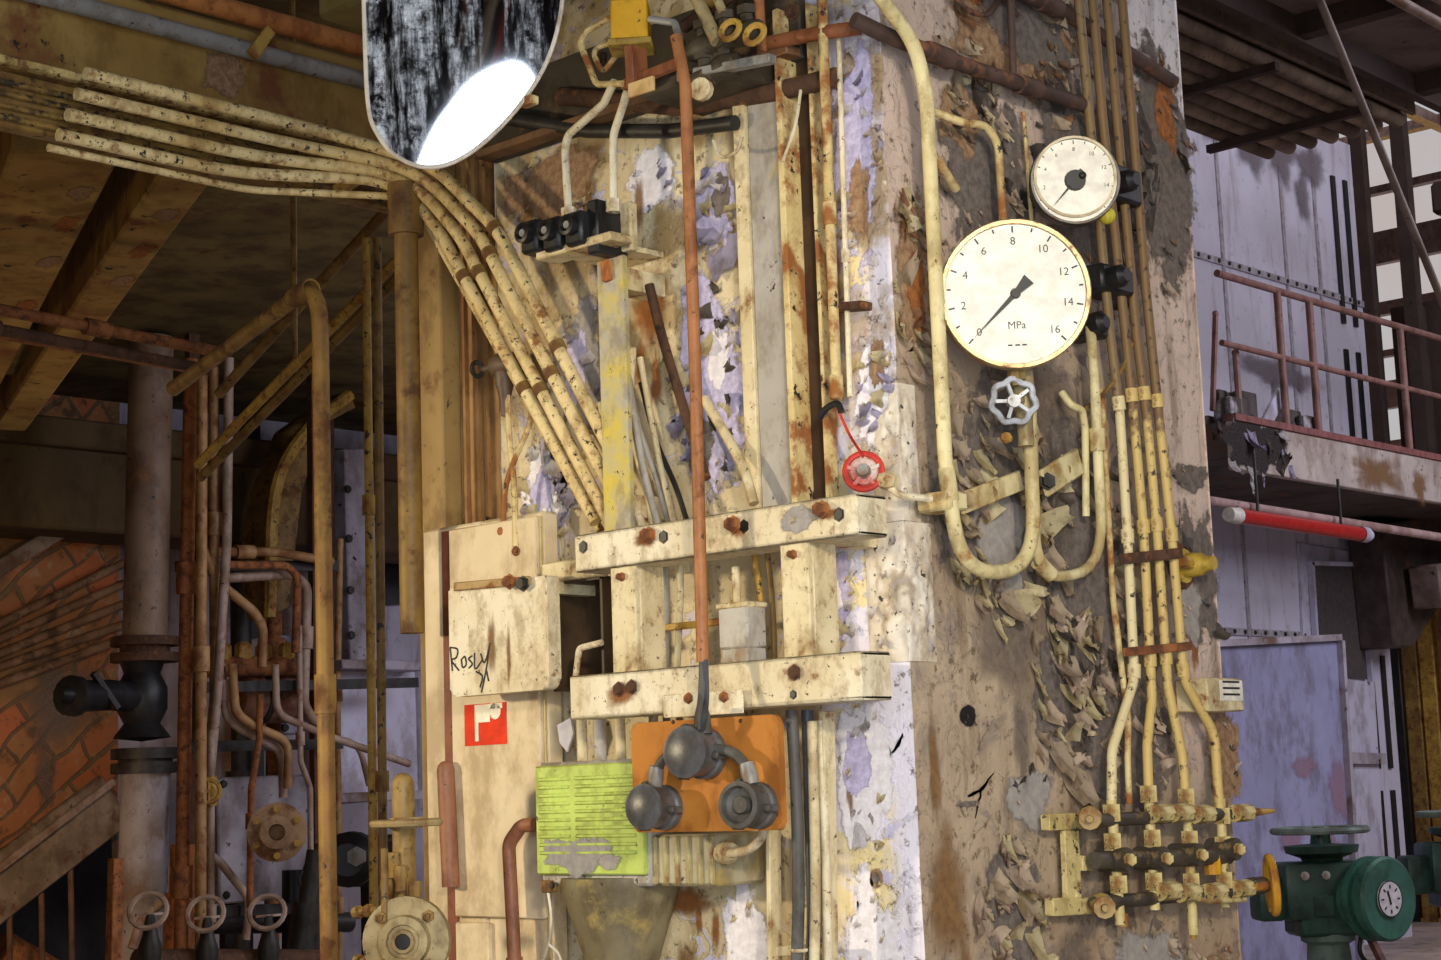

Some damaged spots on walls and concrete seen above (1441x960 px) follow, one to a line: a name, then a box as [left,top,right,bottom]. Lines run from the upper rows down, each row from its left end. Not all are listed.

peeling [626,144,675,214]
peeling [664,162,745,503]
peeling [831,0,1198,960]
spalling [1171,463,1231,651]
peeling [1206,712,1243,807]
peeling [1114,931,1233,960]